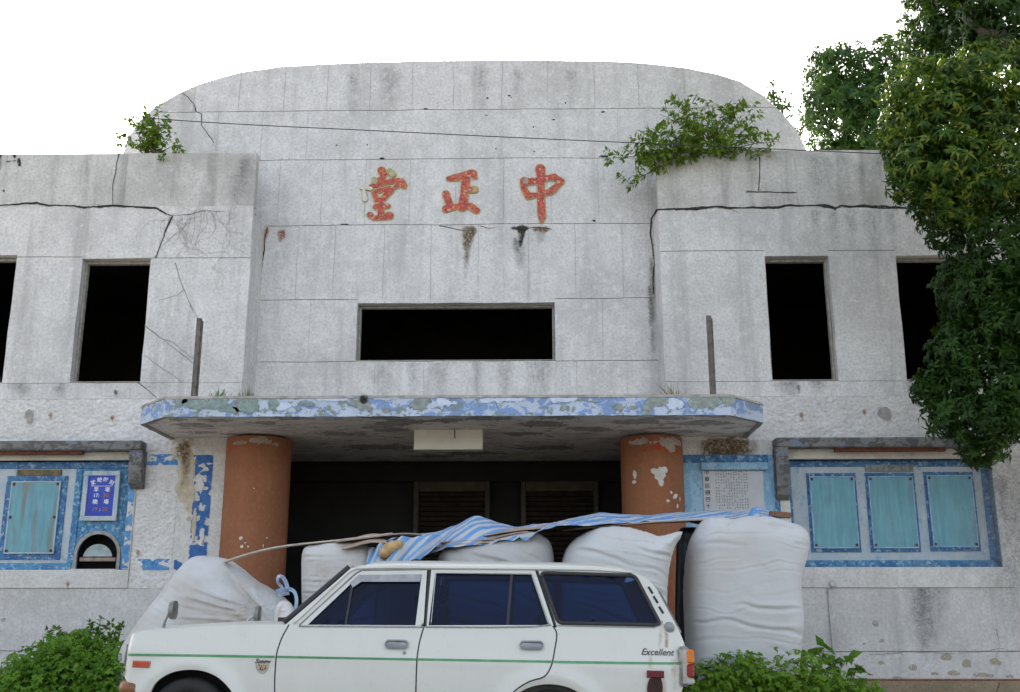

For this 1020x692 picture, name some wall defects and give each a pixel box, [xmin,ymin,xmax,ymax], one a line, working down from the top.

crack [0,153,224,318]
leakage [463,226,476,254]
leakage [511,225,528,246]
crack [649,157,907,294]
peeling [168,395,735,546]